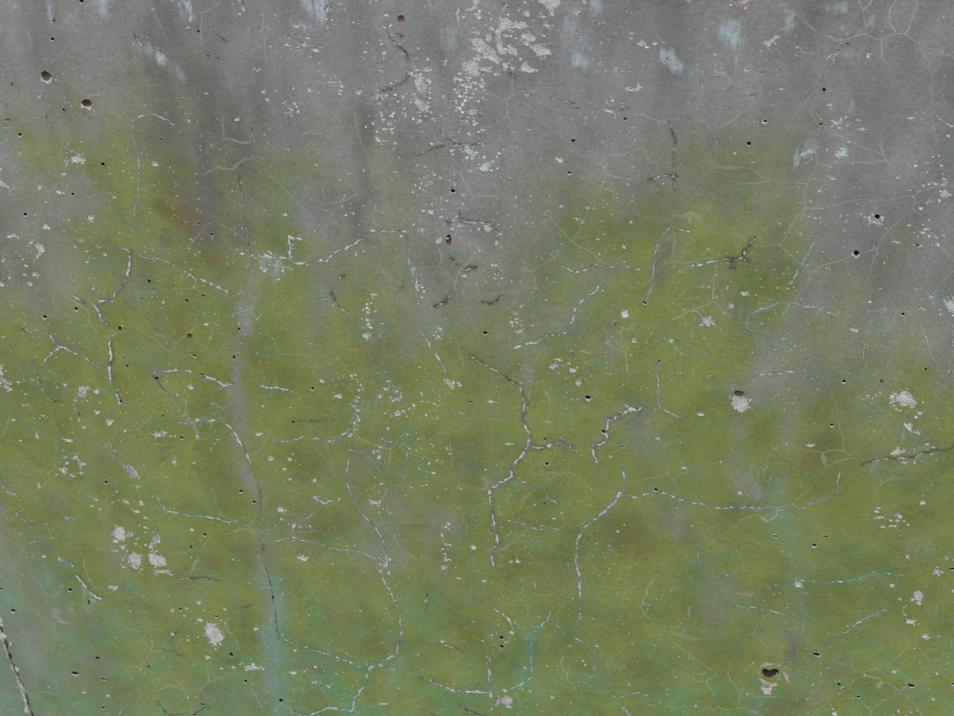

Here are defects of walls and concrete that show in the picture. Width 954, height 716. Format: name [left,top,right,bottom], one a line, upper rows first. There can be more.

peeling [253,0,561,245]
crack [21,245,230,414]
peeling [90,464,173,576]
water stain [0,0,417,716]
crack [157,393,598,716]
water stain [476,256,585,410]
crack [469,354,678,566]
water stain [366,394,954,716]
water stain [706,198,813,338]
crack [575,449,947,616]
peeling [889,388,936,464]
spalling [757,661,789,695]